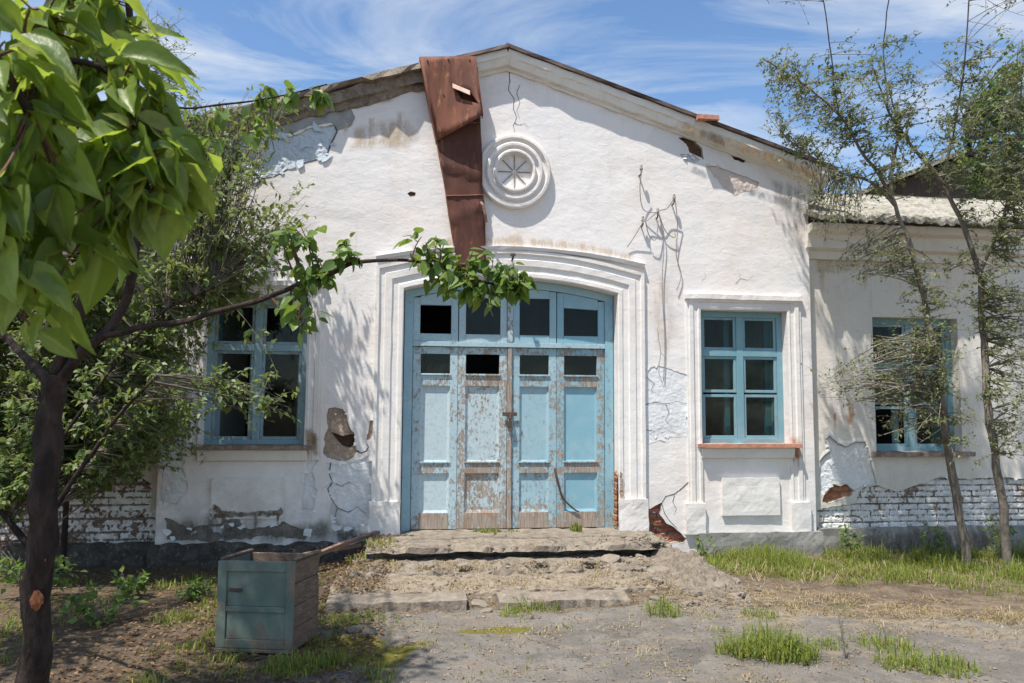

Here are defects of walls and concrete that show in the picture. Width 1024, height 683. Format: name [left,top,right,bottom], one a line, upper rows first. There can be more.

crack [508,72,528,131]
flaking render [224,109,355,184]
flaking render [679,137,759,196]
crack [645,328,685,434]
flaking render [0,495,30,547]
flaking render [58,441,312,546]
peeling [302,407,373,532]
crack [328,463,358,516]
flaking render [613,470,624,527]
flaking render [648,502,686,543]
flaking render [817,475,1024,528]